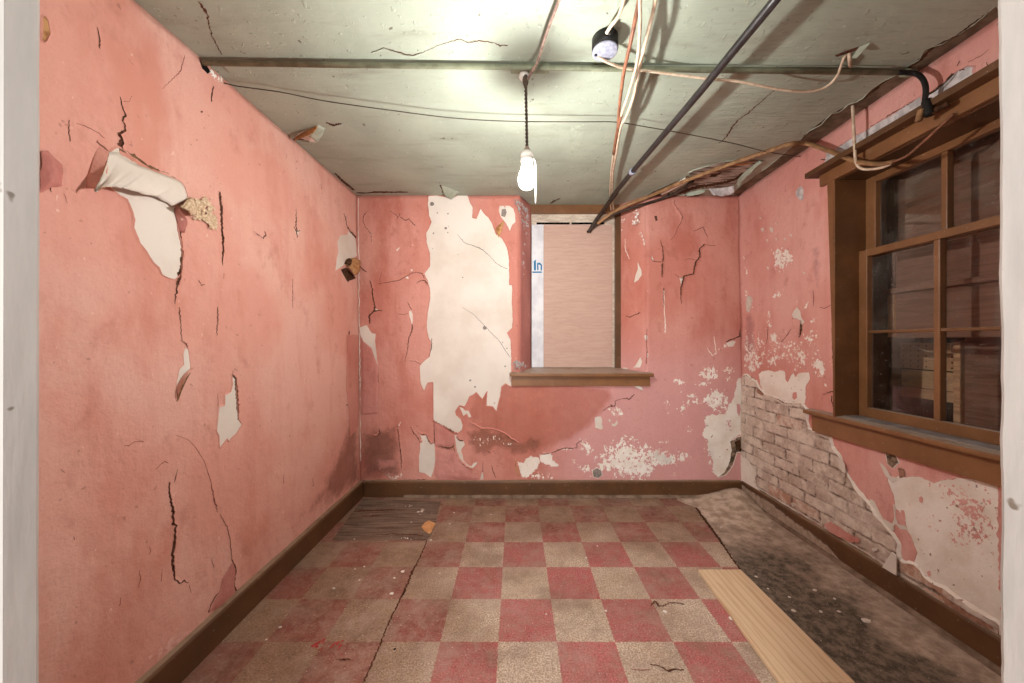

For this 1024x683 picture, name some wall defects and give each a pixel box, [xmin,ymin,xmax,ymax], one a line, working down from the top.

crack [68,96,132,152]
crack [197,1,222,55]
crack [371,39,508,57]
peeling [86,145,218,301]
crack [168,470,191,590]
crack [176,435,237,591]
peeling [216,370,242,449]
peeling [401,185,529,480]
flaking render [572,406,691,480]
crack [625,200,716,364]
flaking render [663,301,1001,635]
peeling [695,507,1001,683]